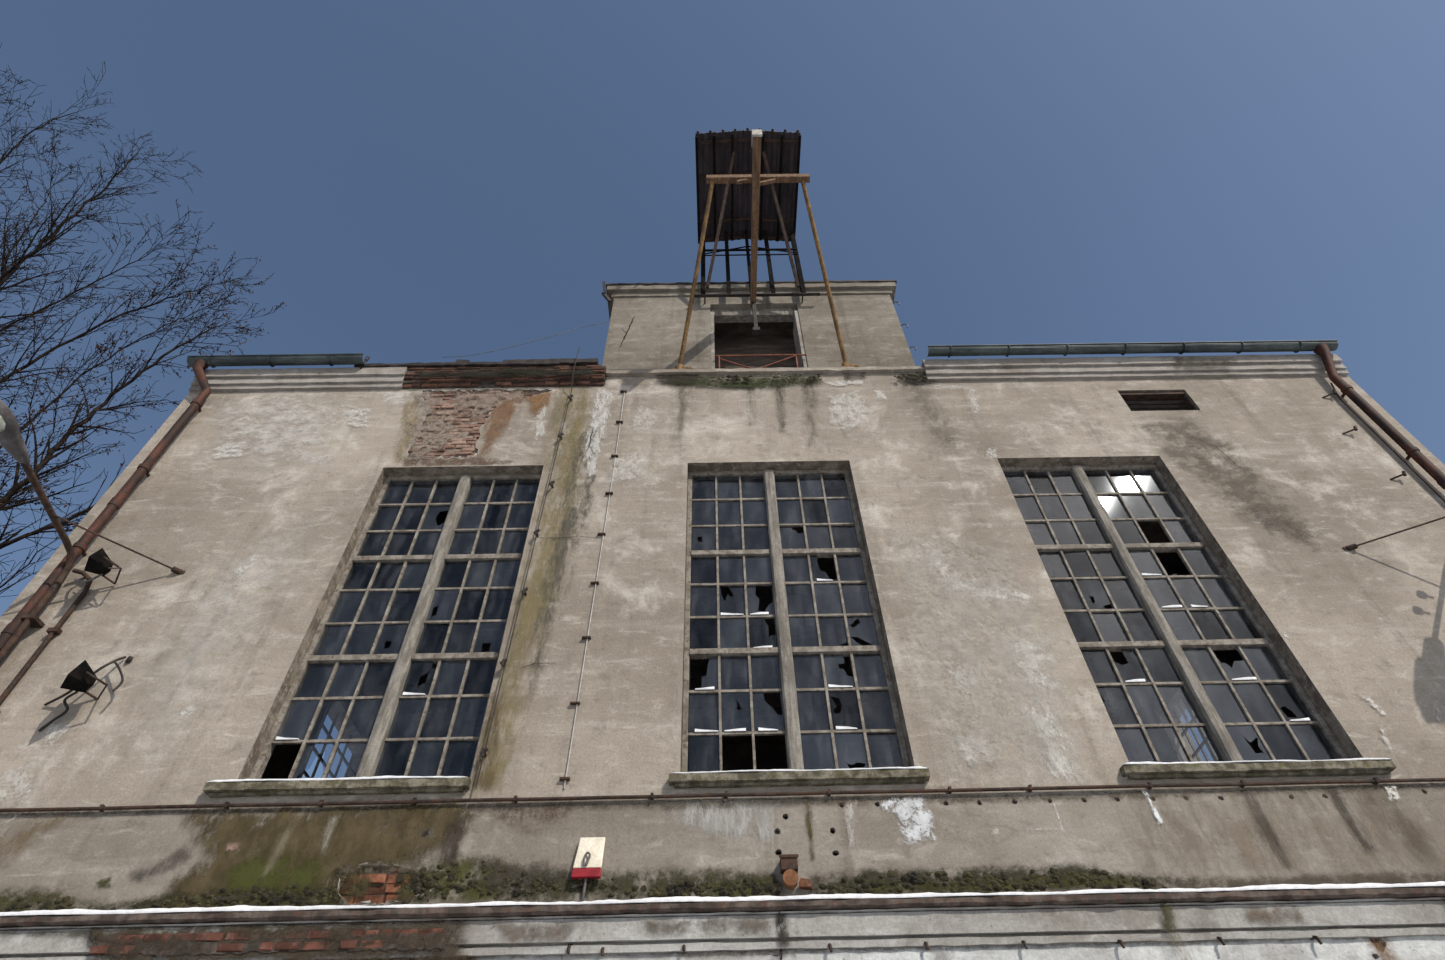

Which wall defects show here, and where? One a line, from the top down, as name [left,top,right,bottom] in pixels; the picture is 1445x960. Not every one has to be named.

flaking render [408,388,554,458]
damp [0,803,475,960]
flaking render [337,862,435,905]
damp [649,911,794,955]